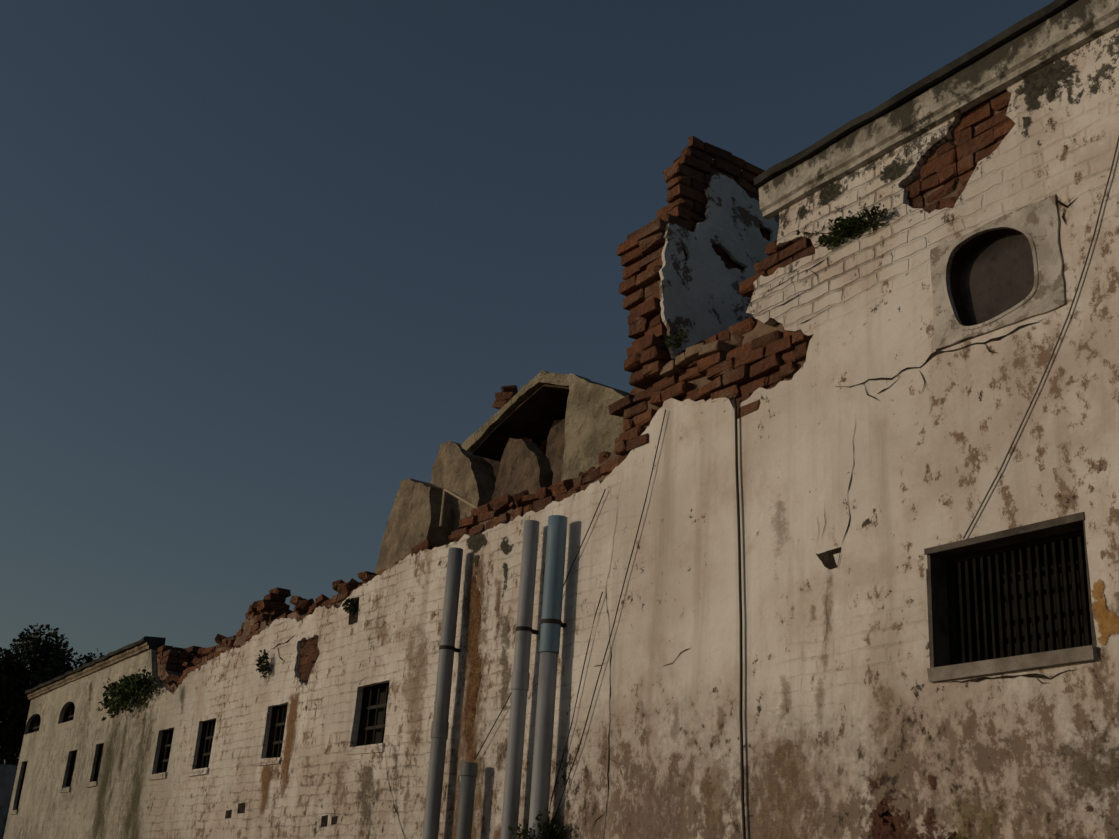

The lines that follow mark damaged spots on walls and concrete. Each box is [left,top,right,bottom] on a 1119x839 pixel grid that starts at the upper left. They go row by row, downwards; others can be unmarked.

water stain [1016,58,1079,129]
flaking render [905,89,1015,213]
flaking render [739,237,815,298]
flaking render [608,317,813,466]
crack [816,320,1041,546]
flaking render [1091,579,1119,645]
flaking render [298,636,320,683]
water stain [92,718,151,839]
peeling [858,775,974,839]
water stain [1051,730,1119,801]